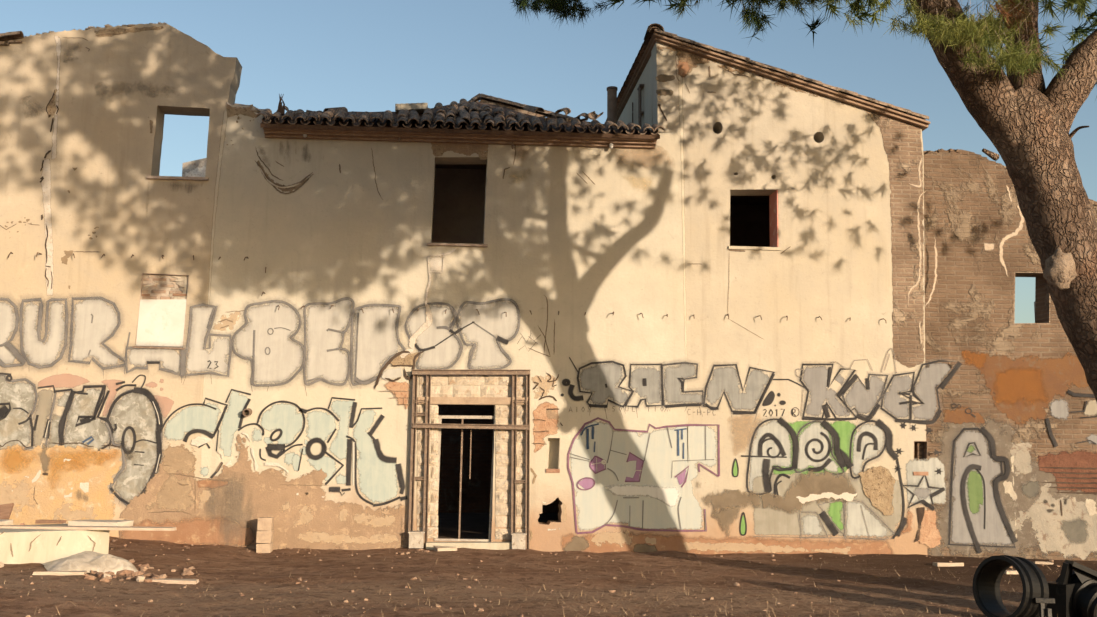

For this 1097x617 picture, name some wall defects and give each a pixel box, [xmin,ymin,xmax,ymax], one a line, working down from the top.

crack [40,37,61,295]
crack [984,185,1024,276]
crack [400,247,458,358]
flaking render [374,351,424,409]
flaking render [532,373,563,452]
peeling [0,432,407,550]